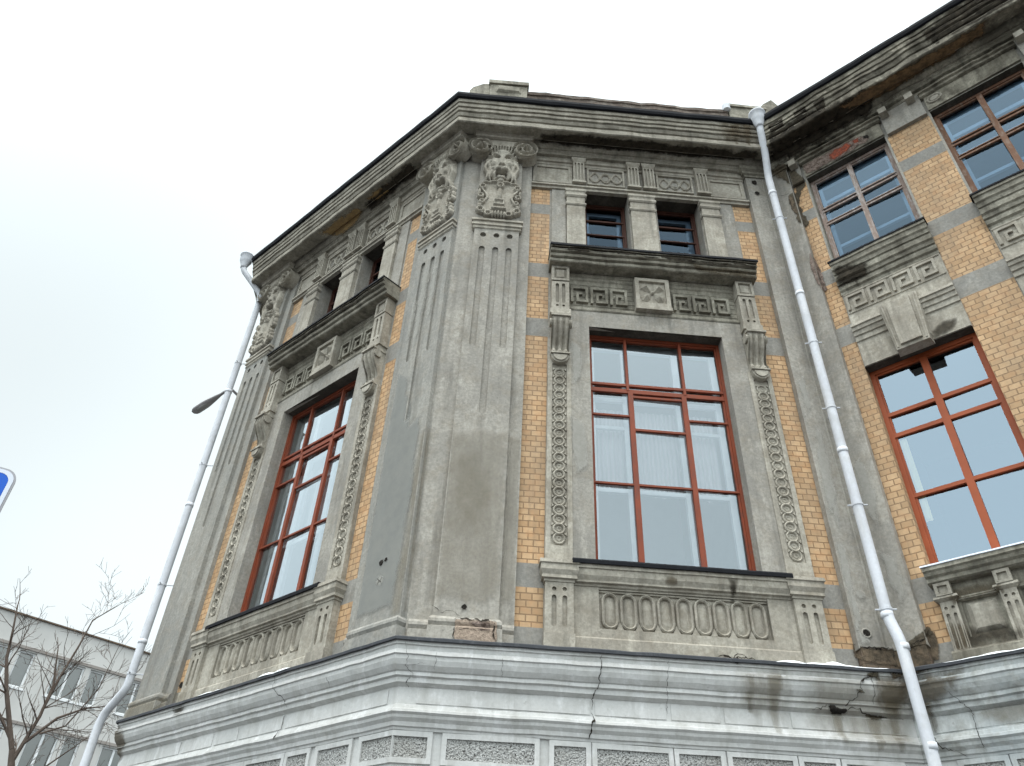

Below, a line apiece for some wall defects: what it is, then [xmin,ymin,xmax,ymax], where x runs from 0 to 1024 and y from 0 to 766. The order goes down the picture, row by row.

damp [540,0,1012,161]
flaking render [771,135,869,228]
damp [834,263,867,287]
peeling [854,460,877,520]
flaking render [452,617,497,642]
flaking render [814,544,939,719]
crack [589,656,602,738]
damp [879,674,955,724]